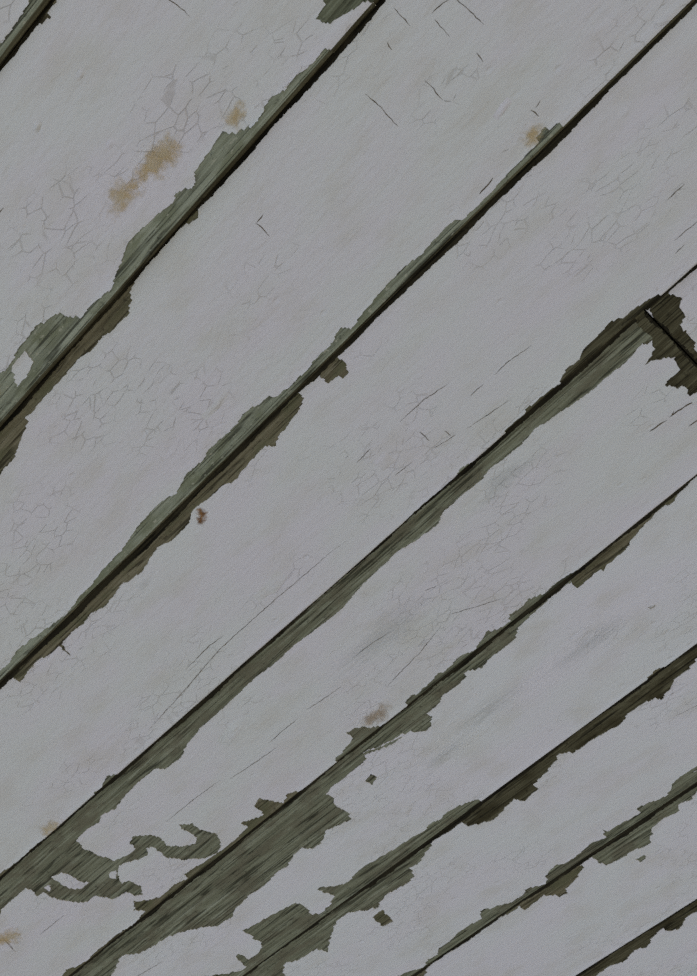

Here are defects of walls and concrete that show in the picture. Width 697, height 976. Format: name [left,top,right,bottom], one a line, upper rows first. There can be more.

peeling [0,48,333,474]
peeling [0,123,564,683]
peeling [316,0,379,24]
peeling [0,293,697,976]